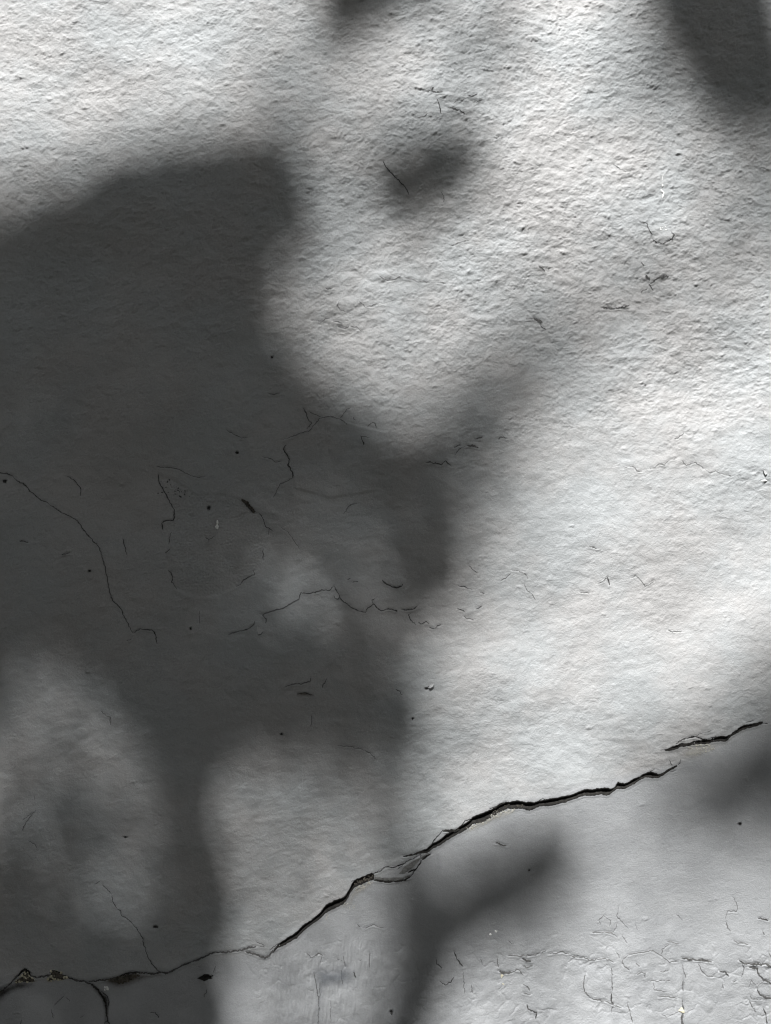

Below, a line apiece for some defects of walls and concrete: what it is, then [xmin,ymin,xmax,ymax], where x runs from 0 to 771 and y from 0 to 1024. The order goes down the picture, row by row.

crack [0,472,157,642]
crack [157,466,205,589]
crack [238,407,376,586]
crack [228,568,536,635]
crack [3,720,771,1024]